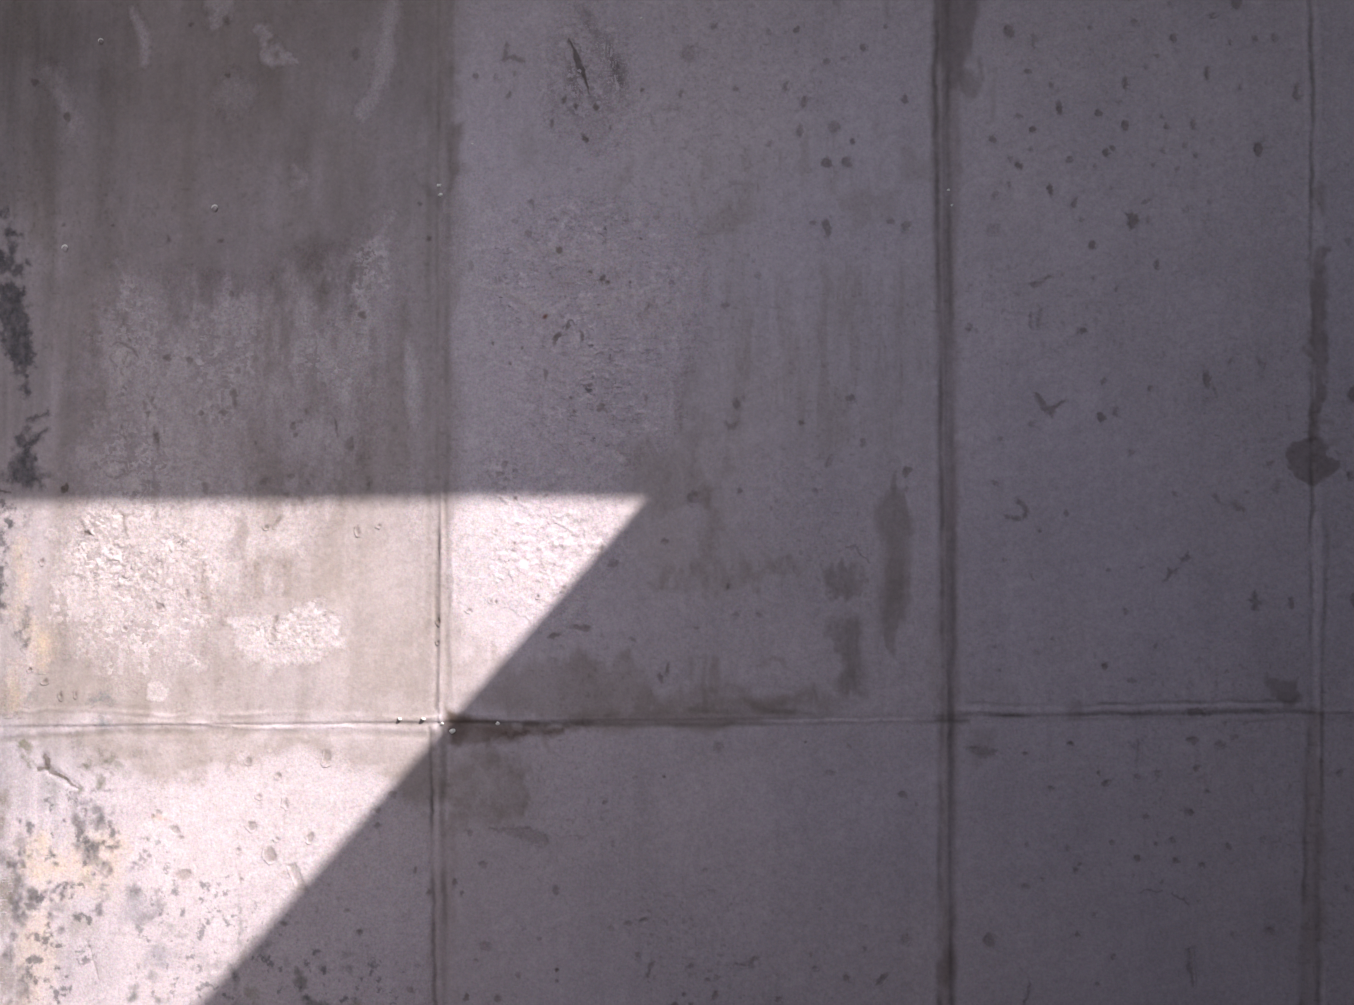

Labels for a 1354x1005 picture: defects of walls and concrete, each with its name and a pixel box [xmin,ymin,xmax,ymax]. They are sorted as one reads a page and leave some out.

damp [0,0,992,1005]
damp [1284,242,1350,488]